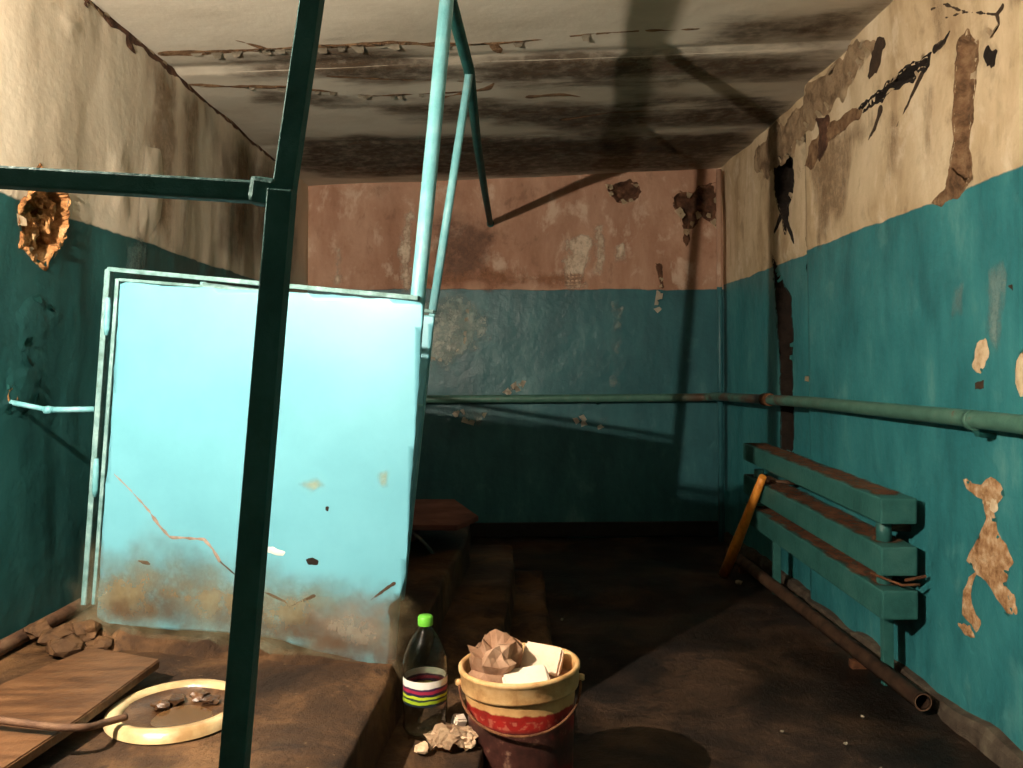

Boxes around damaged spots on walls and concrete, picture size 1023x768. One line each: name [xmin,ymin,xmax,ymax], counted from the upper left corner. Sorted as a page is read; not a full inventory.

water stain [722,13,859,41]
water stain [315,49,433,83]
water stain [475,52,816,82]
water stain [301,135,426,176]
water stain [386,105,429,114]
water stain [438,97,780,176]
spalling [754,28,998,207]
spalling [17,191,71,271]
spalling [672,182,716,246]
peeling [972,338,989,389]
peeling [1015,349,1023,397]
peeling [958,477,1017,638]